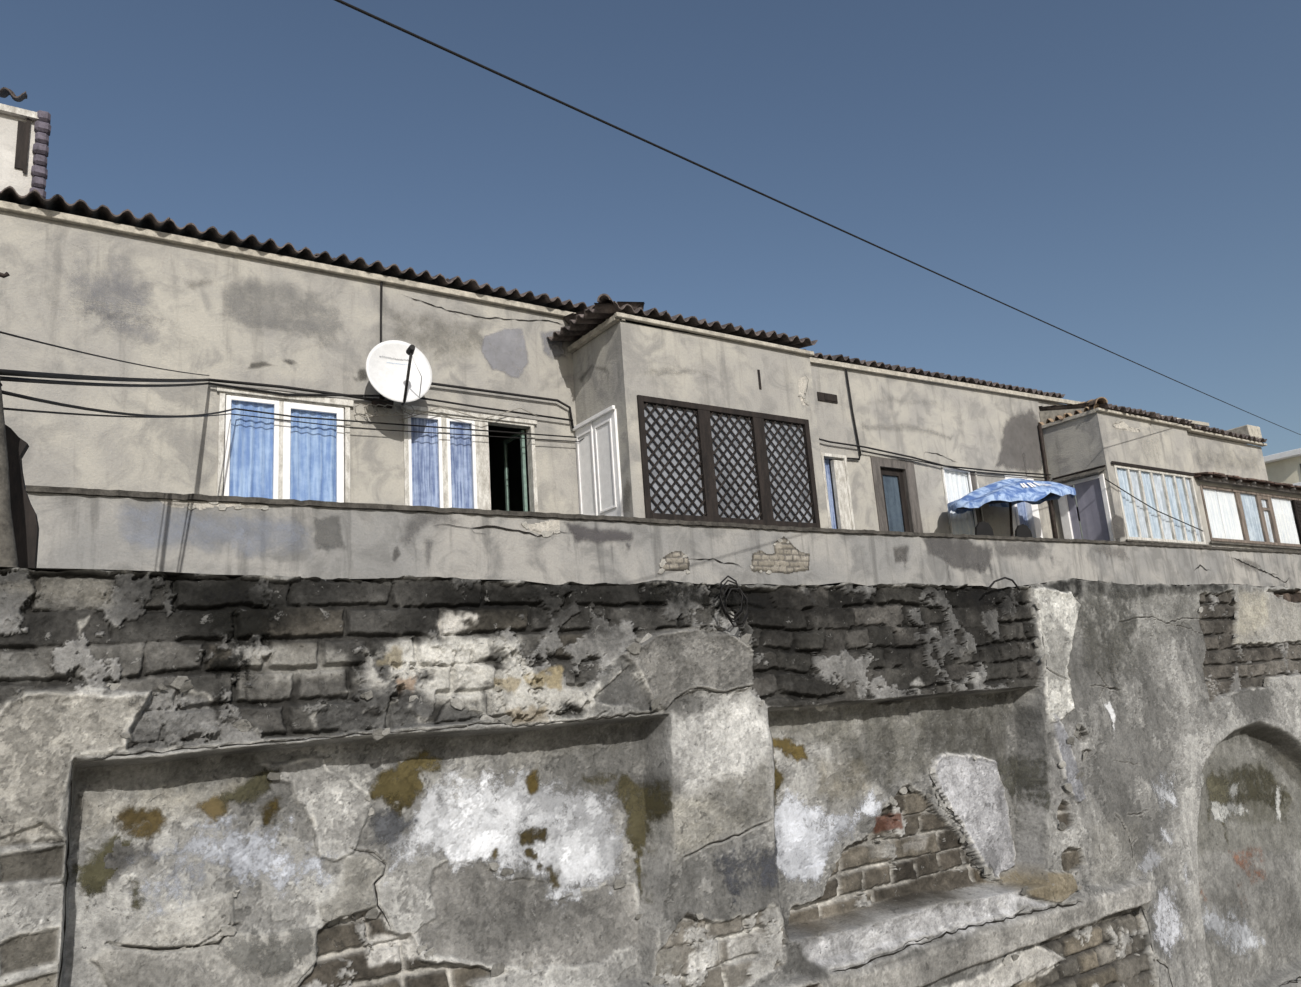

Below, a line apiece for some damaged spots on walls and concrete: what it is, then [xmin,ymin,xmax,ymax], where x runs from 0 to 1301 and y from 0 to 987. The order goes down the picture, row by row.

crack [434,524,566,540]
spalling [1199,589,1301,703]
spalling [0,536,1092,884]
leakage [131,805,330,912]
crack [40,686,750,987]
spalling [293,752,1016,987]
crack [688,824,761,856]
crack [929,760,994,882]
spalling [0,929,59,987]
crack [833,901,1080,972]
crack [1142,908,1173,987]